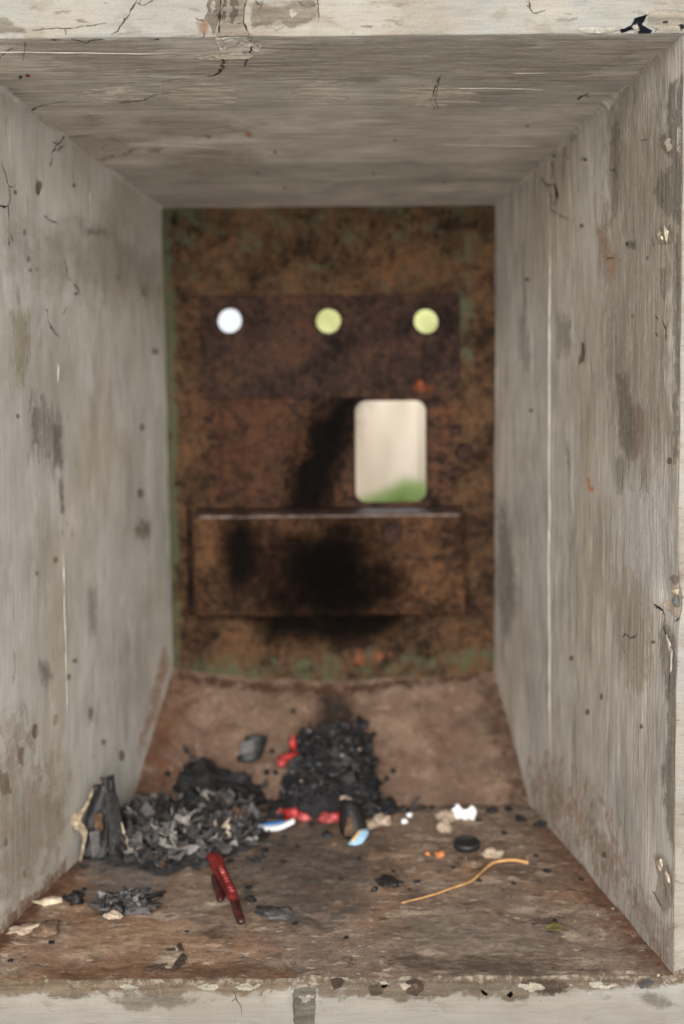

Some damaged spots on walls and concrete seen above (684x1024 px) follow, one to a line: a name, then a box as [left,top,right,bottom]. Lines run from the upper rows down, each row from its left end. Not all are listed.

crack [0,0,153,60]
peeling [198,0,317,69]
peeling [577,9,684,34]
peeling [651,575,681,847]